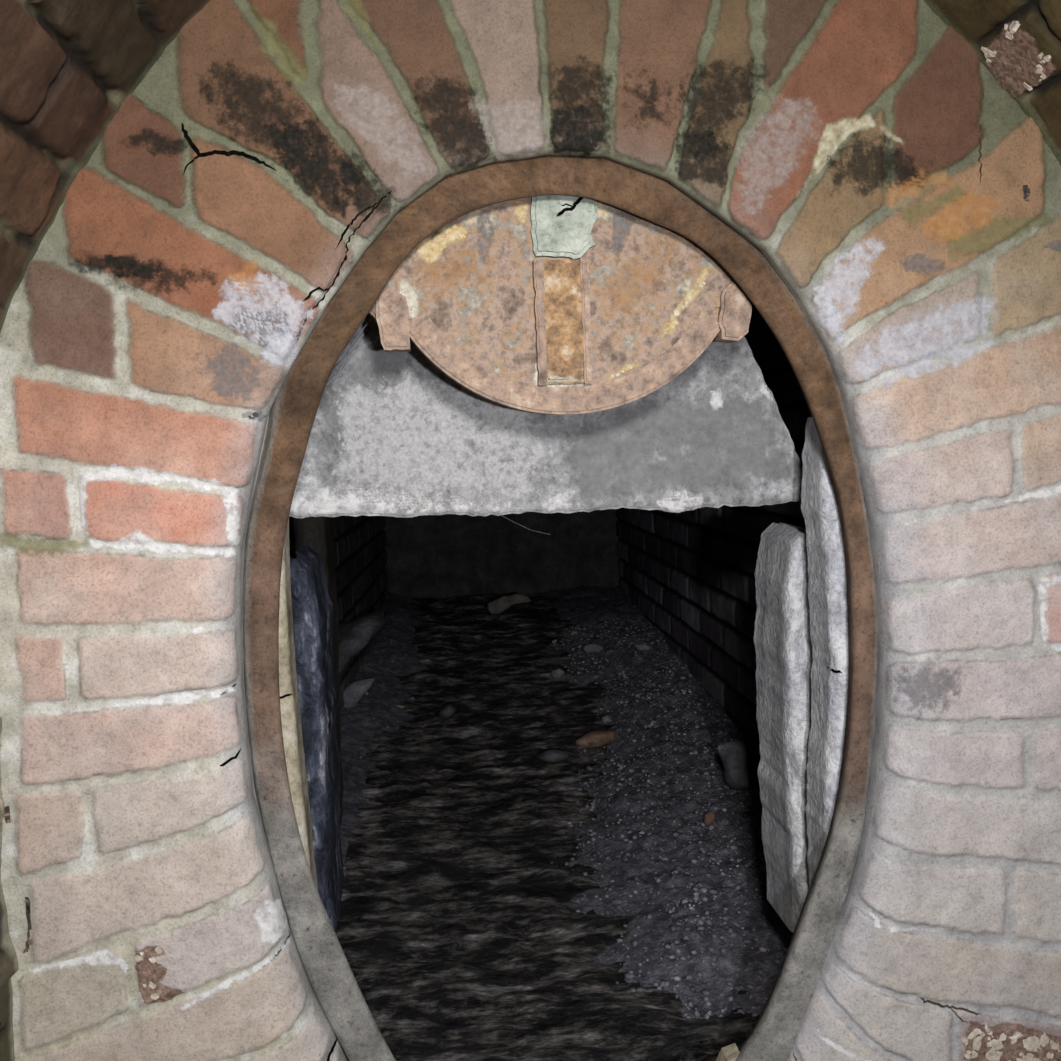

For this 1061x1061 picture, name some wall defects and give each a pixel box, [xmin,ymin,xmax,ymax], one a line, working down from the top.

spalling [981,21,1056,98]
crack [181,123,276,175]
leakage [270,120,361,217]
leakage [550,105,602,158]
leakage [676,131,727,186]
leakage [803,115,903,190]
crack [285,190,392,363]
leakage [213,273,313,366]
spalling [135,945,184,1004]
crack [921,998,981,1023]
crack [327,1036,338,1061]
spalling [961,1021,1061,1061]